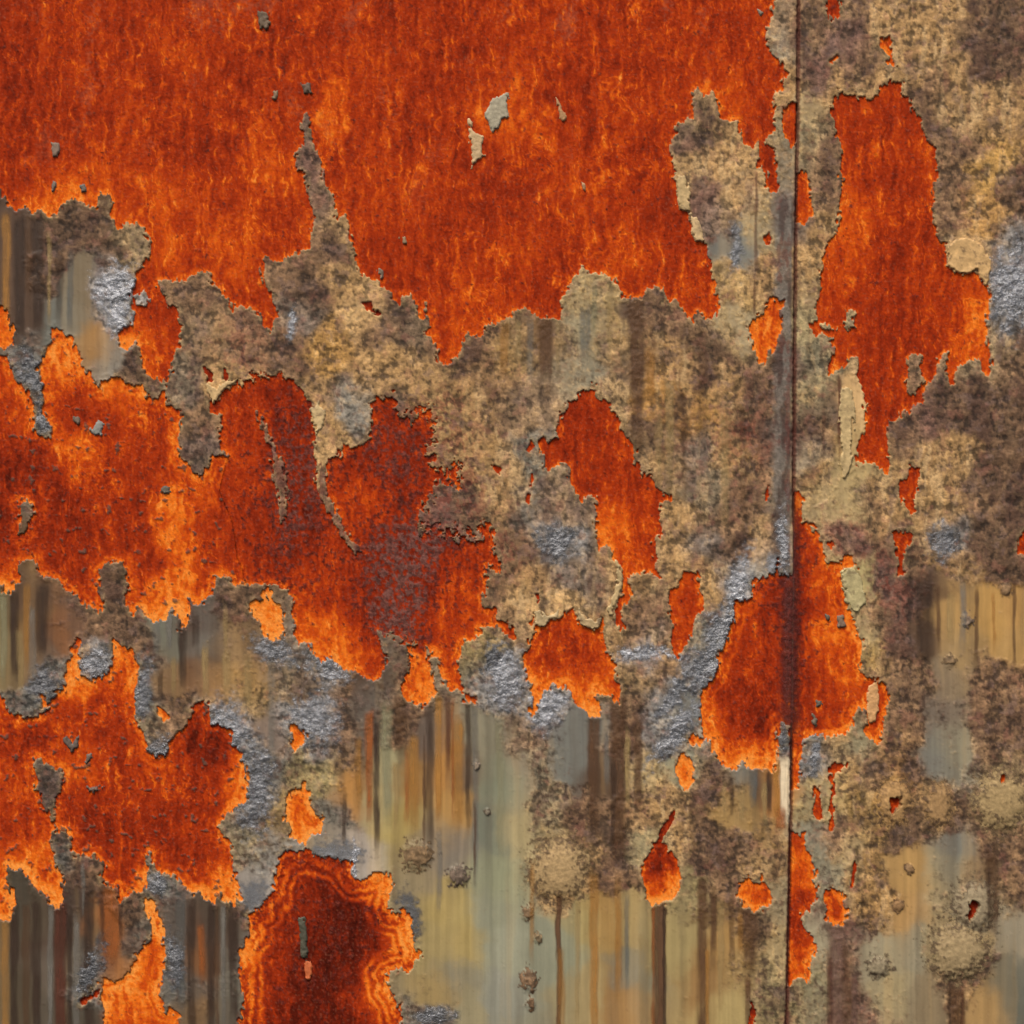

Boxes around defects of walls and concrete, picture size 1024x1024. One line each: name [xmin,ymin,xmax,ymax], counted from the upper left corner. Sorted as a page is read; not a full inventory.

peeling [674,172,704,243]
corrosion [809,79,994,475]
peeling [309,400,326,435]
corrosion [0,0,796,717]
peeling [578,559,624,629]
peeling [621,556,754,761]
corrosion [0,637,250,1024]
corrosion [237,781,423,1024]
leakage [357,700,470,837]
leakage [588,700,641,849]
leakage [652,904,665,1024]
leakage [753,758,790,827]